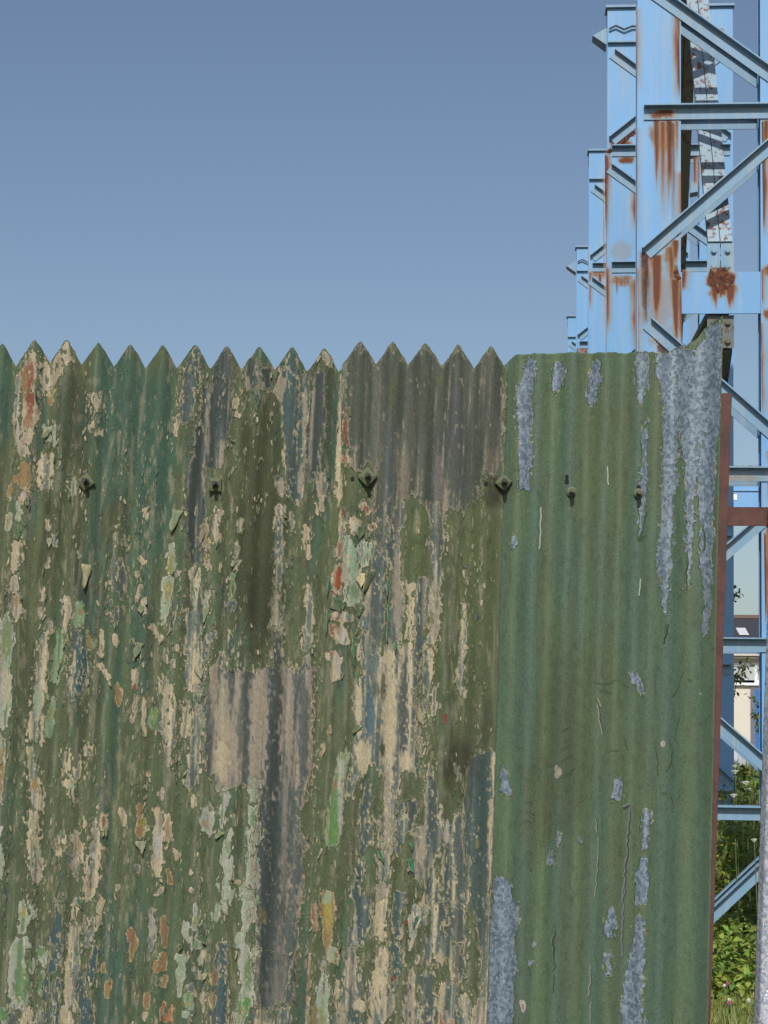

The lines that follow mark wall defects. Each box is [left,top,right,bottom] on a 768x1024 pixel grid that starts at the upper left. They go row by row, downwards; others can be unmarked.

rust [650,110,681,214]
rust [589,140,687,352]
rust [706,269,737,306]
peeling [512,355,568,492]
peeling [584,358,604,408]
peeling [632,320,723,639]
peeling [0,340,538,1024]
peeling [628,671,646,696]
peeling [610,775,625,804]
peeling [546,831,565,867]
peeling [601,808,655,1024]